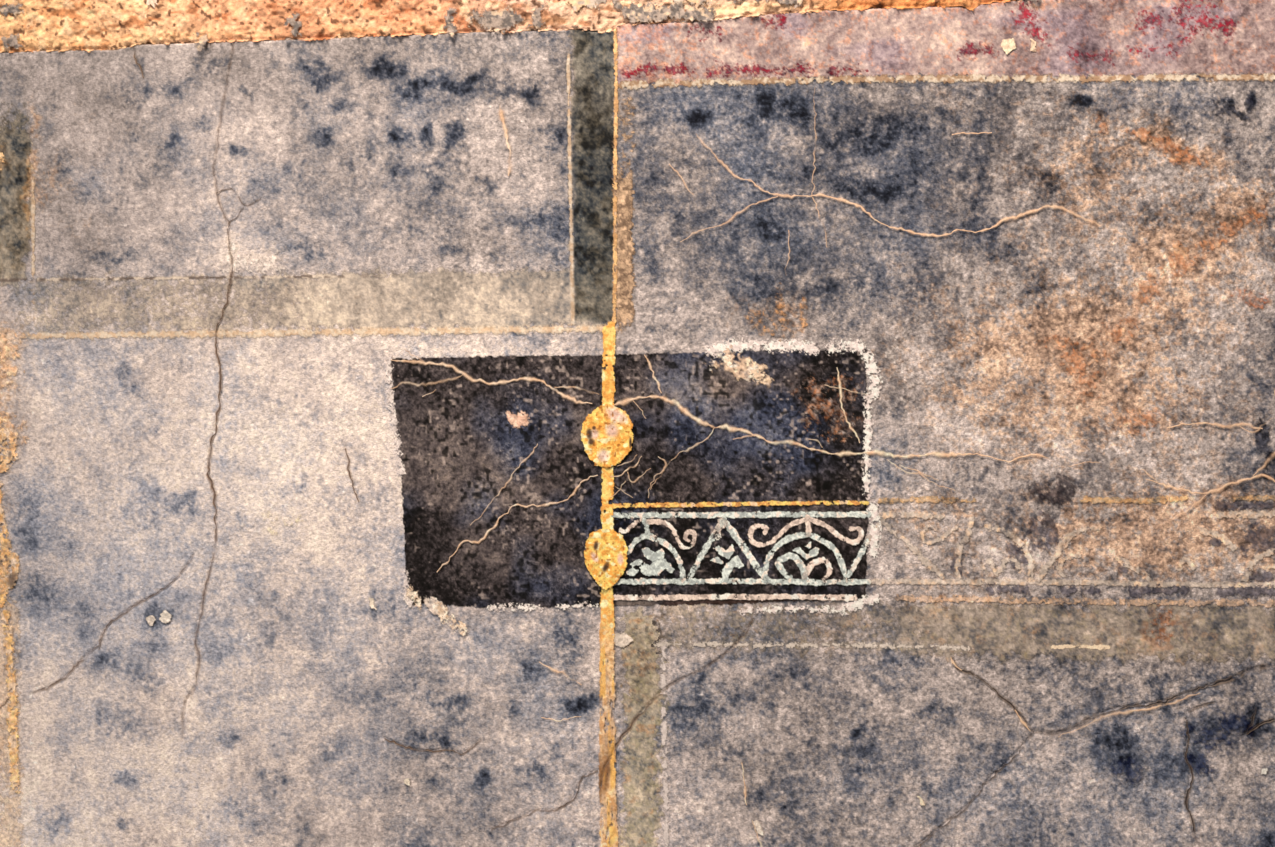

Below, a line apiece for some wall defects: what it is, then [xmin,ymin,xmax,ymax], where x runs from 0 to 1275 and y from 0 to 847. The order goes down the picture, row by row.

flaking render [0,0,1038,54]
crack [696,154,1095,237]
flaking render [0,327,26,388]
crack [43,189,255,690]
crack [391,351,1092,572]
crack [1141,422,1275,514]
crack [917,658,1275,847]